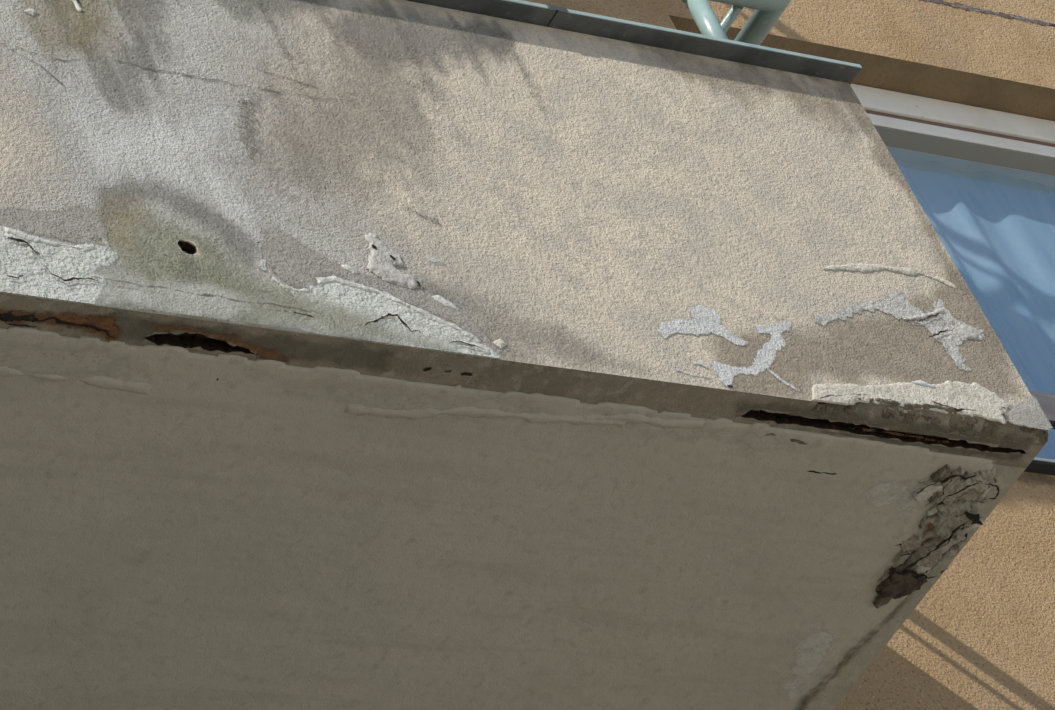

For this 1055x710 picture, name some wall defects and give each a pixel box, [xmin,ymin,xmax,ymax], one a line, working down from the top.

crack [1,43,79,86]
crack [114,59,356,101]
damp [0,0,507,367]
rust [0,310,121,341]
rust [147,322,289,363]
peeling [0,226,507,358]
peeling [658,304,798,390]
peeling [741,289,1053,454]
spalling [872,464,999,609]